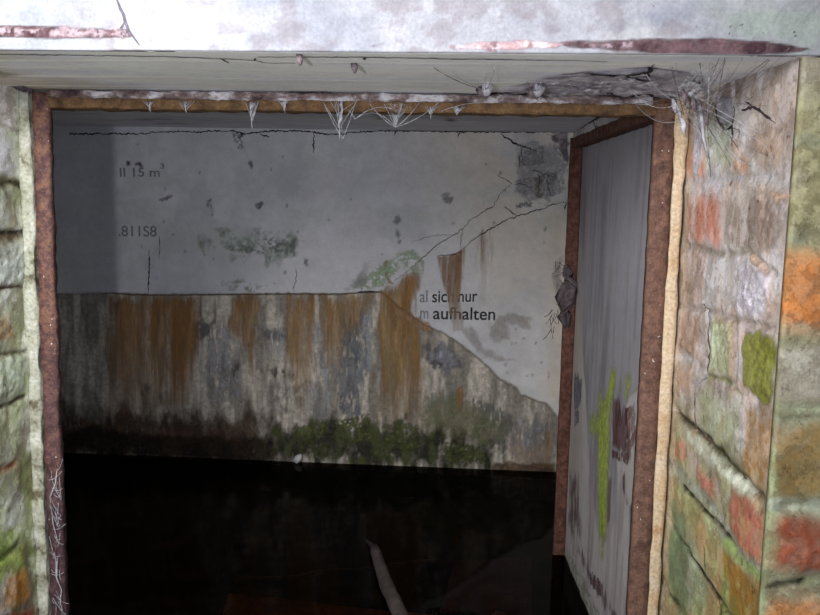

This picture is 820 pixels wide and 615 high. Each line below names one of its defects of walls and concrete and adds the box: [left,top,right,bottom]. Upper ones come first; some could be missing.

crack [0,0,283,64]
leakage [49,89,653,105]
crack [303,57,658,98]
spalling [541,68,701,99]
crack [685,77,775,145]
flaking render [514,132,569,208]
crack [69,117,608,296]
flaking render [58,292,557,472]
leakage [62,401,286,461]
leakage [493,462,555,472]
leakage [569,557,599,615]